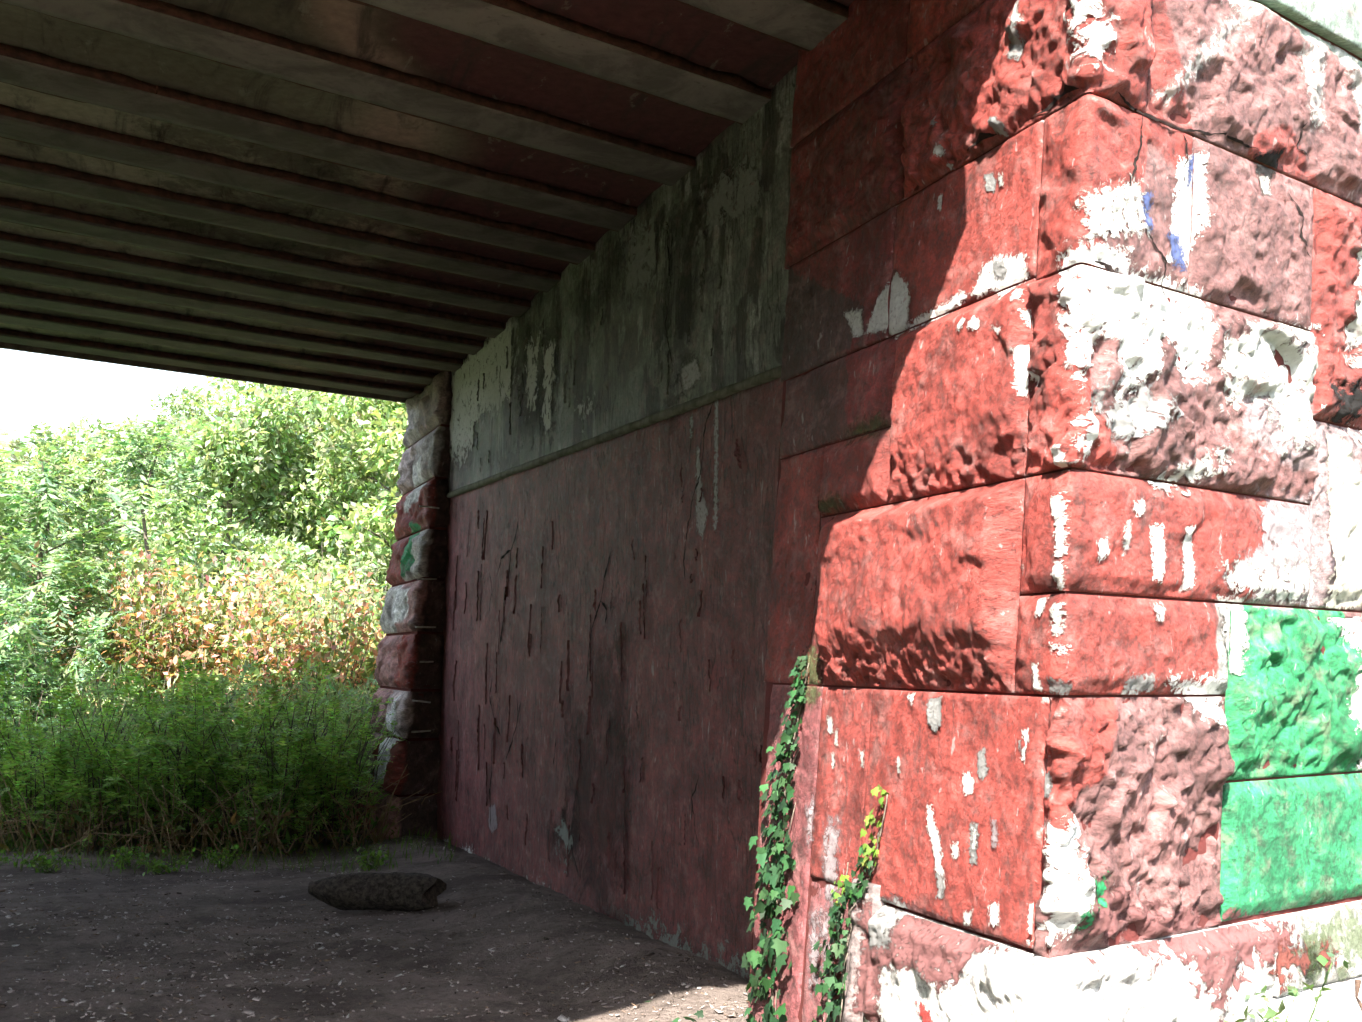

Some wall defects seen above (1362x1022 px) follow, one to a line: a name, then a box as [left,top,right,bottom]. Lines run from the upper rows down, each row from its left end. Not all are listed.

peeling [1063,0,1120,72]
peeling [843,250,1040,397]
peeling [1050,147,1362,735]
crack [489,518,519,643]
crack [489,683,521,825]
crack [586,548,612,683]
peeling [826,715,838,769]
peeling [907,692,943,732]
peeling [1031,662,1075,695]
peeling [1035,491,1072,656]
peeling [850,768,1348,1022]